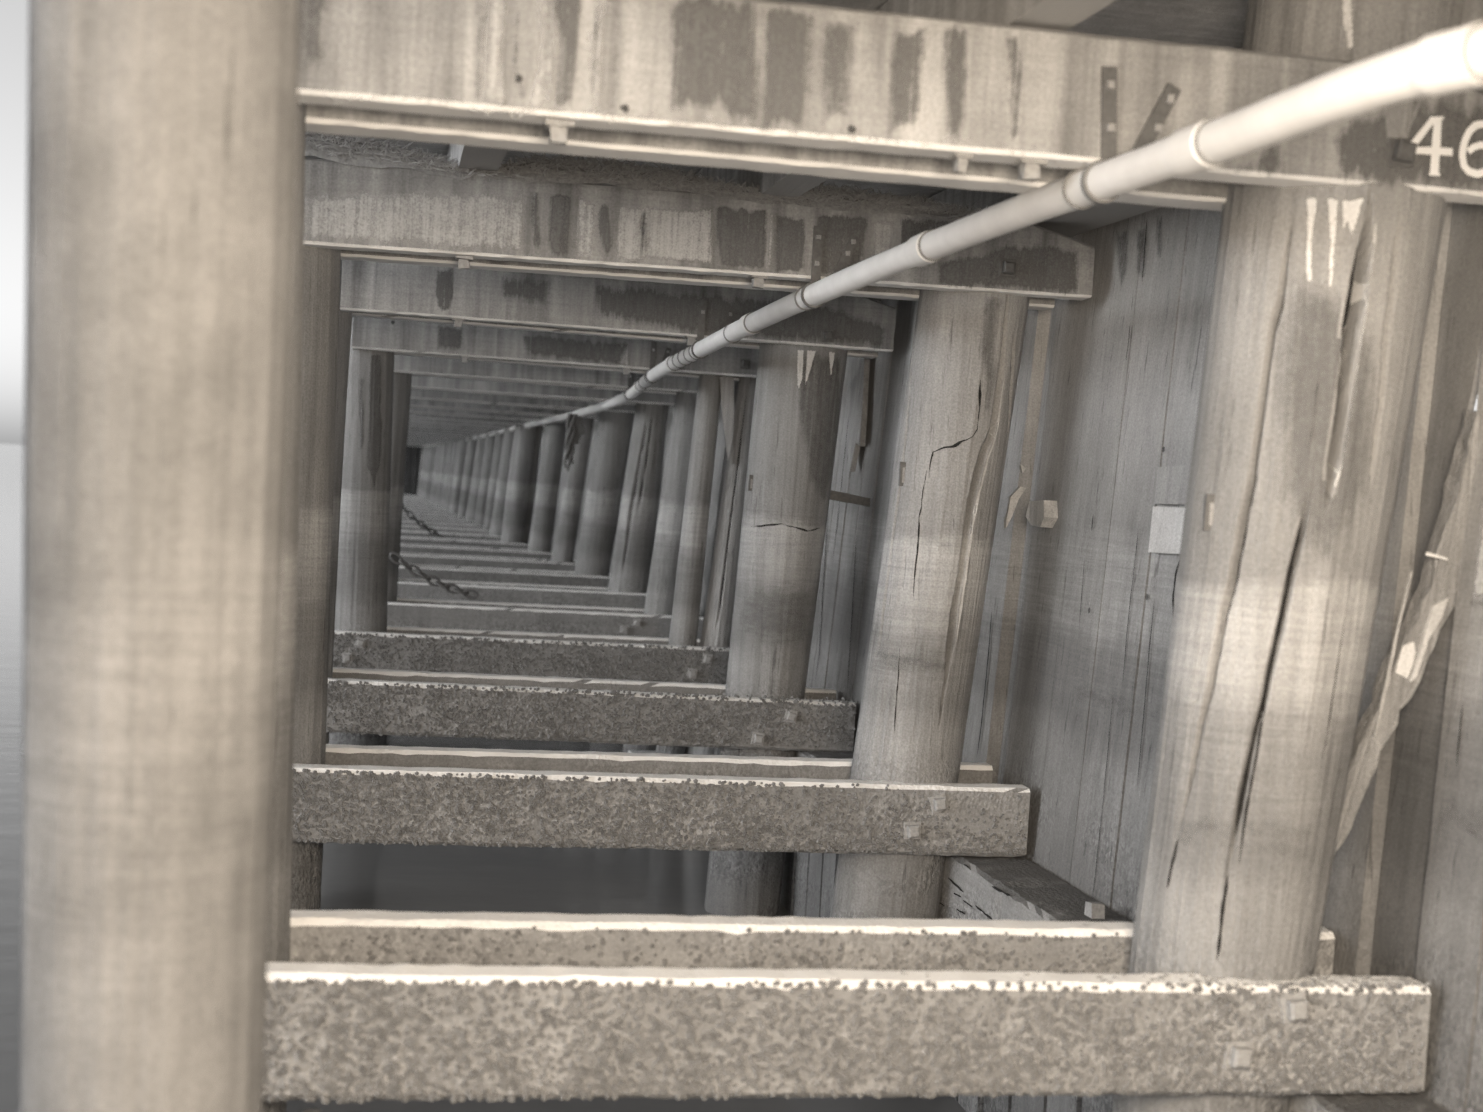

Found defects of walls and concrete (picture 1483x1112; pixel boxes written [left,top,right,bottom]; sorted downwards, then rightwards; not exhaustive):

damp [671,0,807,134]
damp [824,26,852,111]
damp [892,31,924,125]
damp [945,28,966,141]
damp [1008,39,1021,136]
damp [308,192,949,273]
crack [913,380,982,596]
crack [1219,456,1259,660]
peeling [1474,527,1483,596]
crack [893,648,901,733]
crack [1217,516,1303,960]
crack [1323,629,1344,754]